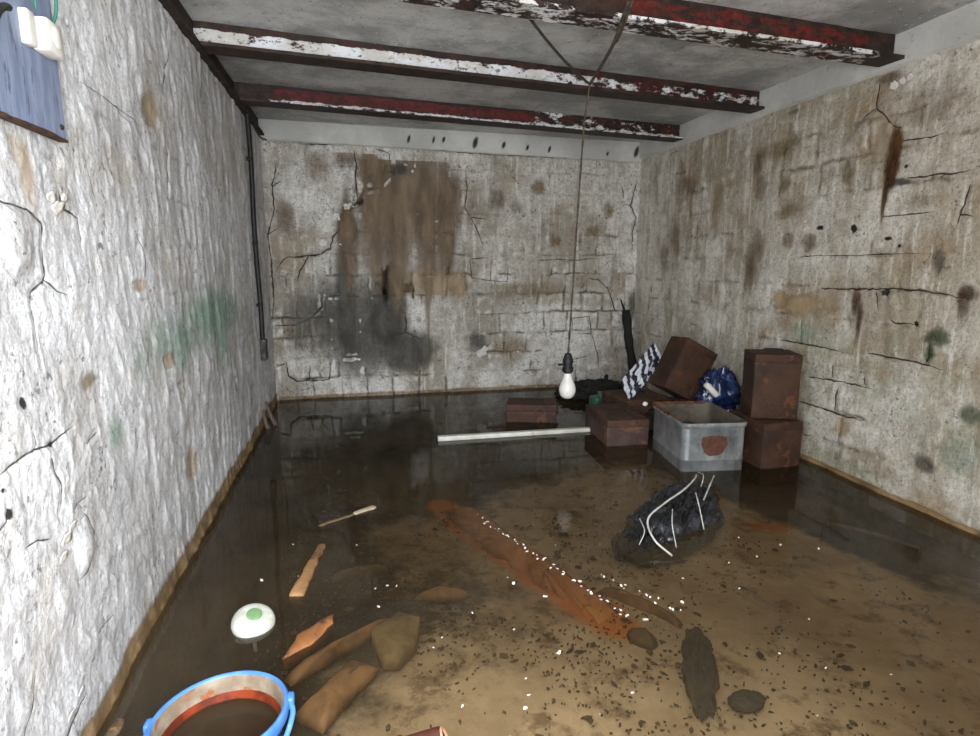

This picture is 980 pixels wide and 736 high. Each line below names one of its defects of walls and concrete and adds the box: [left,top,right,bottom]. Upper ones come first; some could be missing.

crack [863,84,947,141]
crack [350,149,390,210]
corrosion [881,129,903,220]
crack [908,169,974,224]
crack [0,201,68,365]
crack [267,165,338,338]
water stain [294,160,464,371]
crack [803,251,918,259]